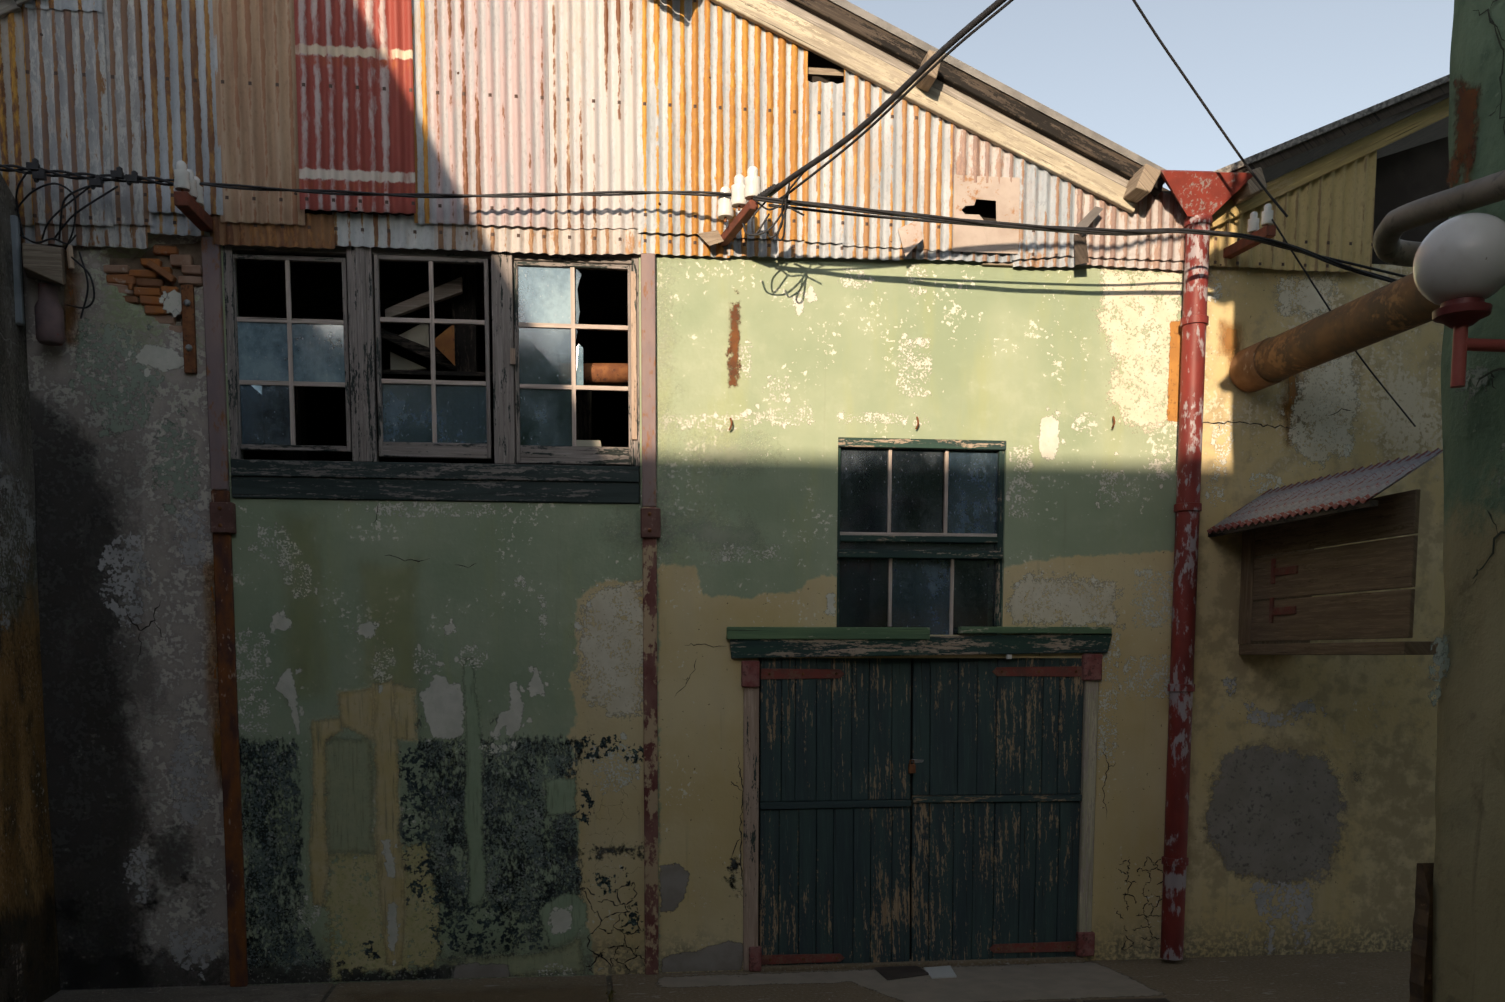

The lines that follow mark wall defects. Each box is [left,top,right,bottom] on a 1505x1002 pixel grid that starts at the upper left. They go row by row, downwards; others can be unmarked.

flaking render [103,241,203,377]
corrosion [726,302,742,387]
peeling [1097,266,1184,434]
peeling [1006,408,1098,518]
damp [0,400,224,1002]
peeling [97,531,152,648]
peeling [235,522,331,980]
peeling [352,621,396,693]
peeling [363,575,644,977]
peeling [122,846,150,904]
crack [578,769,645,974]
damp [248,960,464,984]